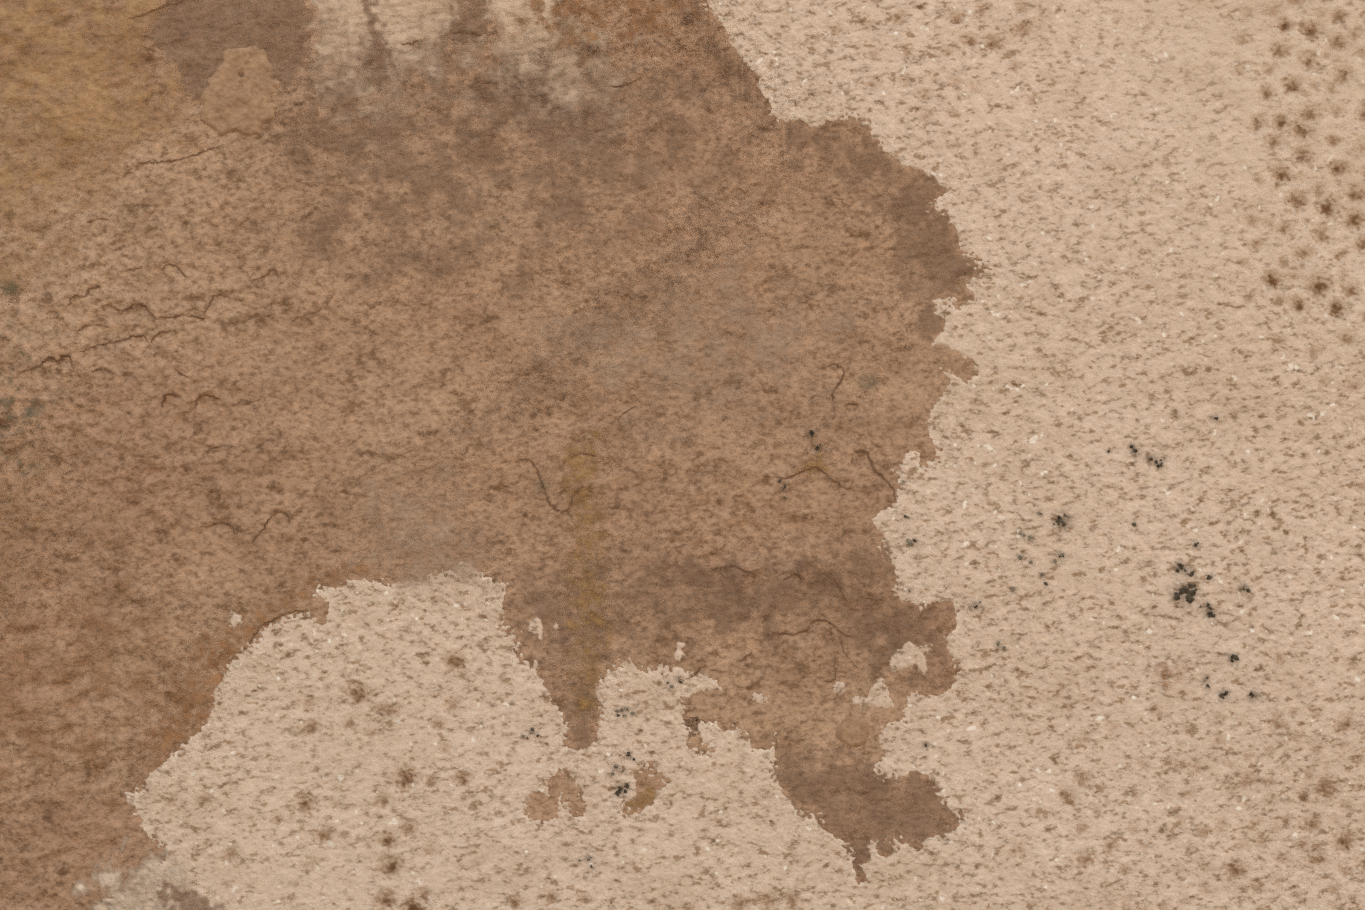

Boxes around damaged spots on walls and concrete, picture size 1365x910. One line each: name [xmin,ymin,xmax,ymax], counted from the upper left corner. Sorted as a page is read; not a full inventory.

water stain [290,0,657,245]
water stain [802,572,938,651]
water stain [611,752,635,797]
water stain [778,764,950,862]